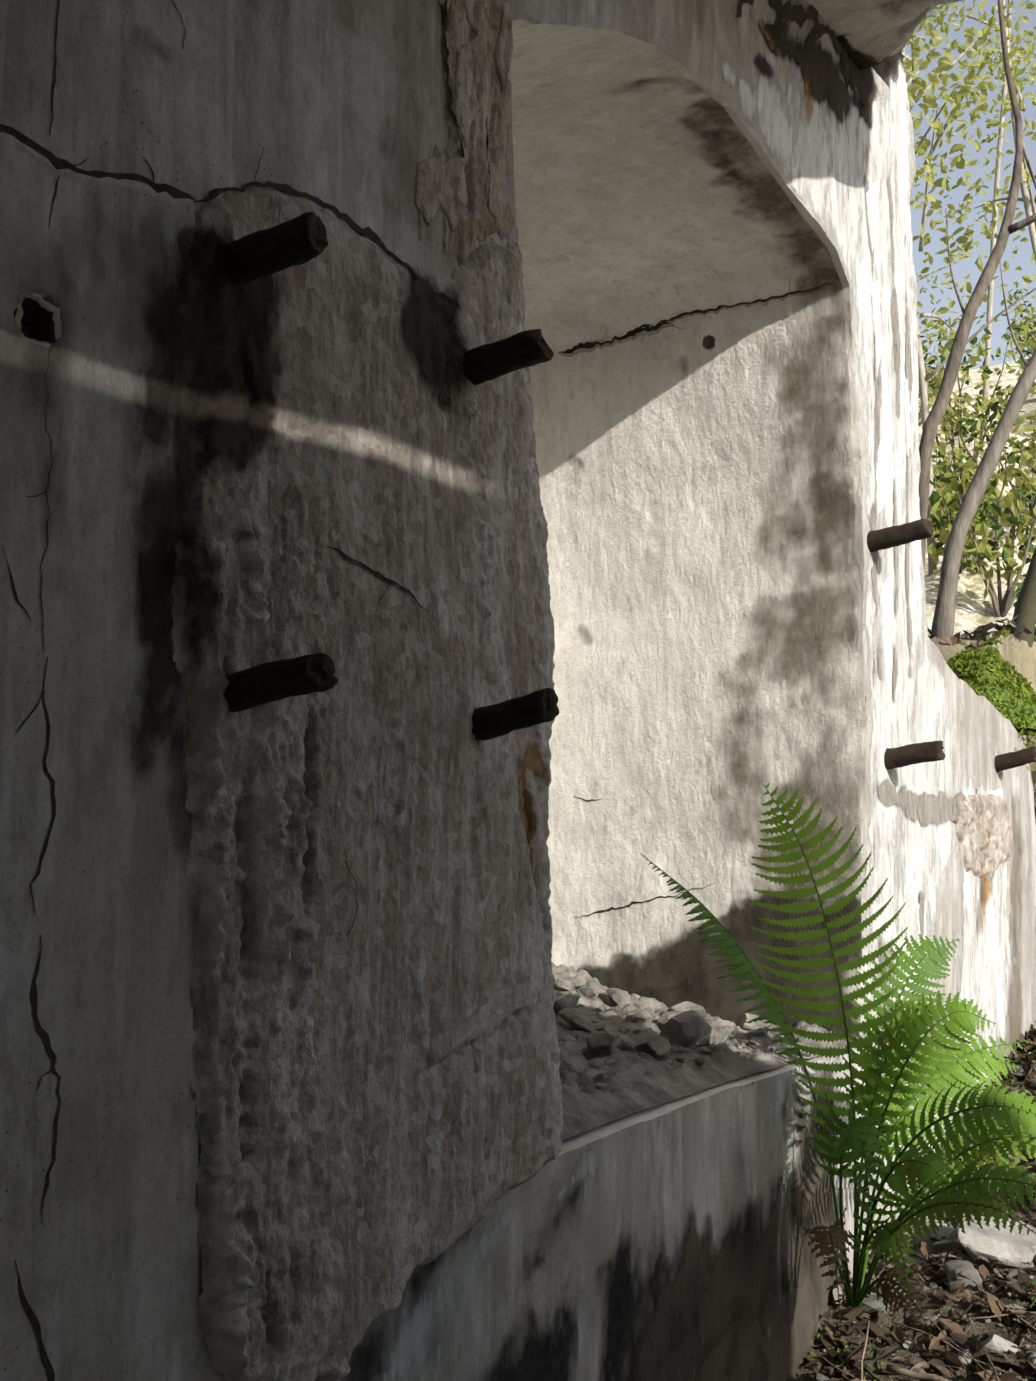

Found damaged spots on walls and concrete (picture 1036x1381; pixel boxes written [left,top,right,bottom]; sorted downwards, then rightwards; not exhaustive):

crack [0,0,462,310]
peeling [414,0,526,350]
crack [558,280,837,357]
damp [684,102,841,288]
damp [764,317,855,571]
peeling [864,176,913,531]
crack [2,346,61,1227]
spalling [169,185,563,1381]
rust [518,743,549,858]
spalling [878,780,1012,881]
damp [487,1298,584,1381]
damp [598,1071,842,1381]